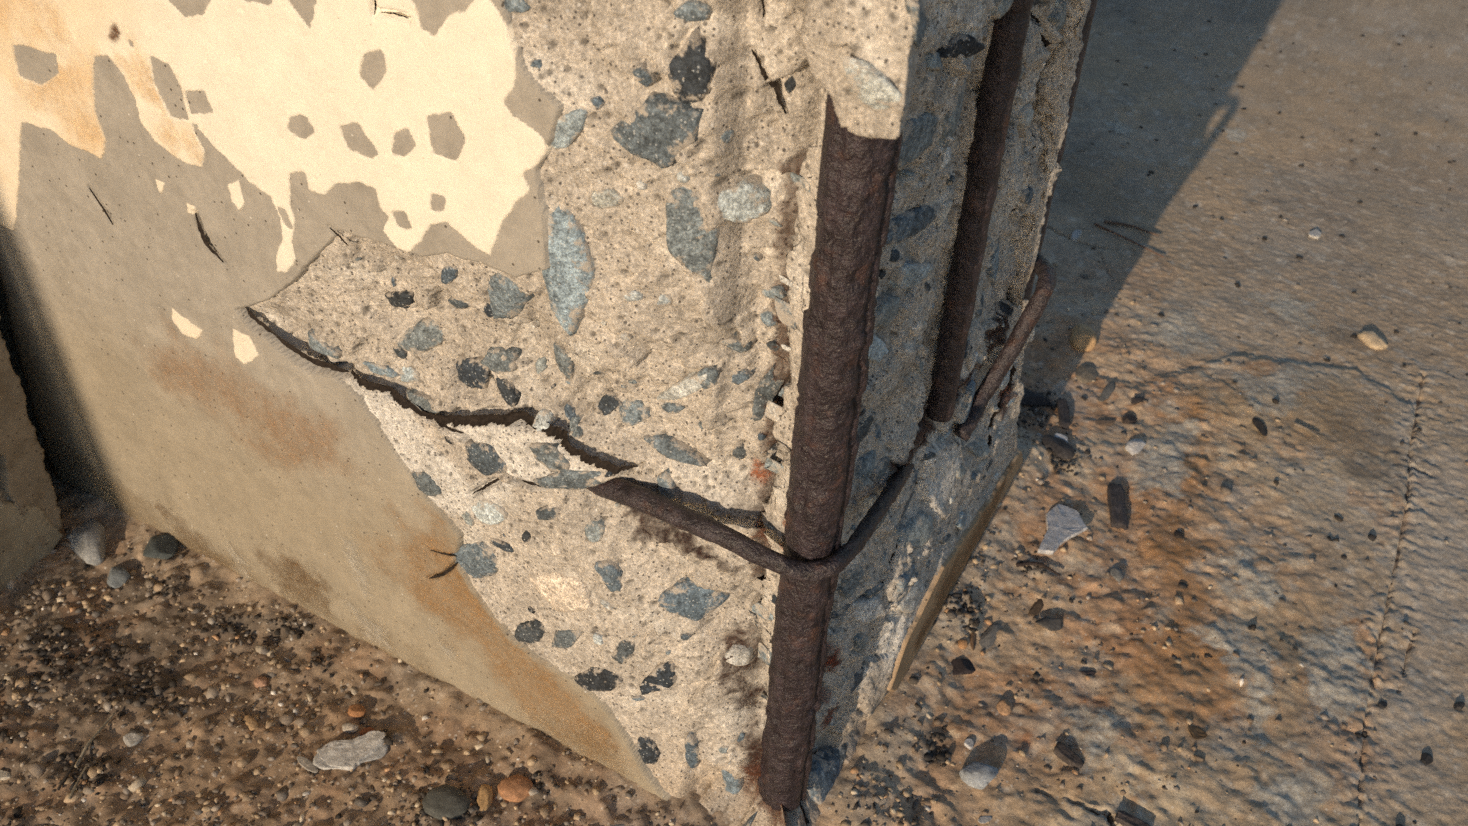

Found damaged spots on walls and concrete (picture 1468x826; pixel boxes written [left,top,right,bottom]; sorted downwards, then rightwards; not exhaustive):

rust [781,154,806,184]
crack [245,307,638,475]
spalling [0,0,1098,826]
rust [751,316,791,548]
rust [889,407,937,474]
rust [956,308,1012,399]
rust [997,384,1013,413]
crack [473,473,541,494]
rust [630,508,721,568]
rust [718,630,765,709]
rust [744,734,805,823]